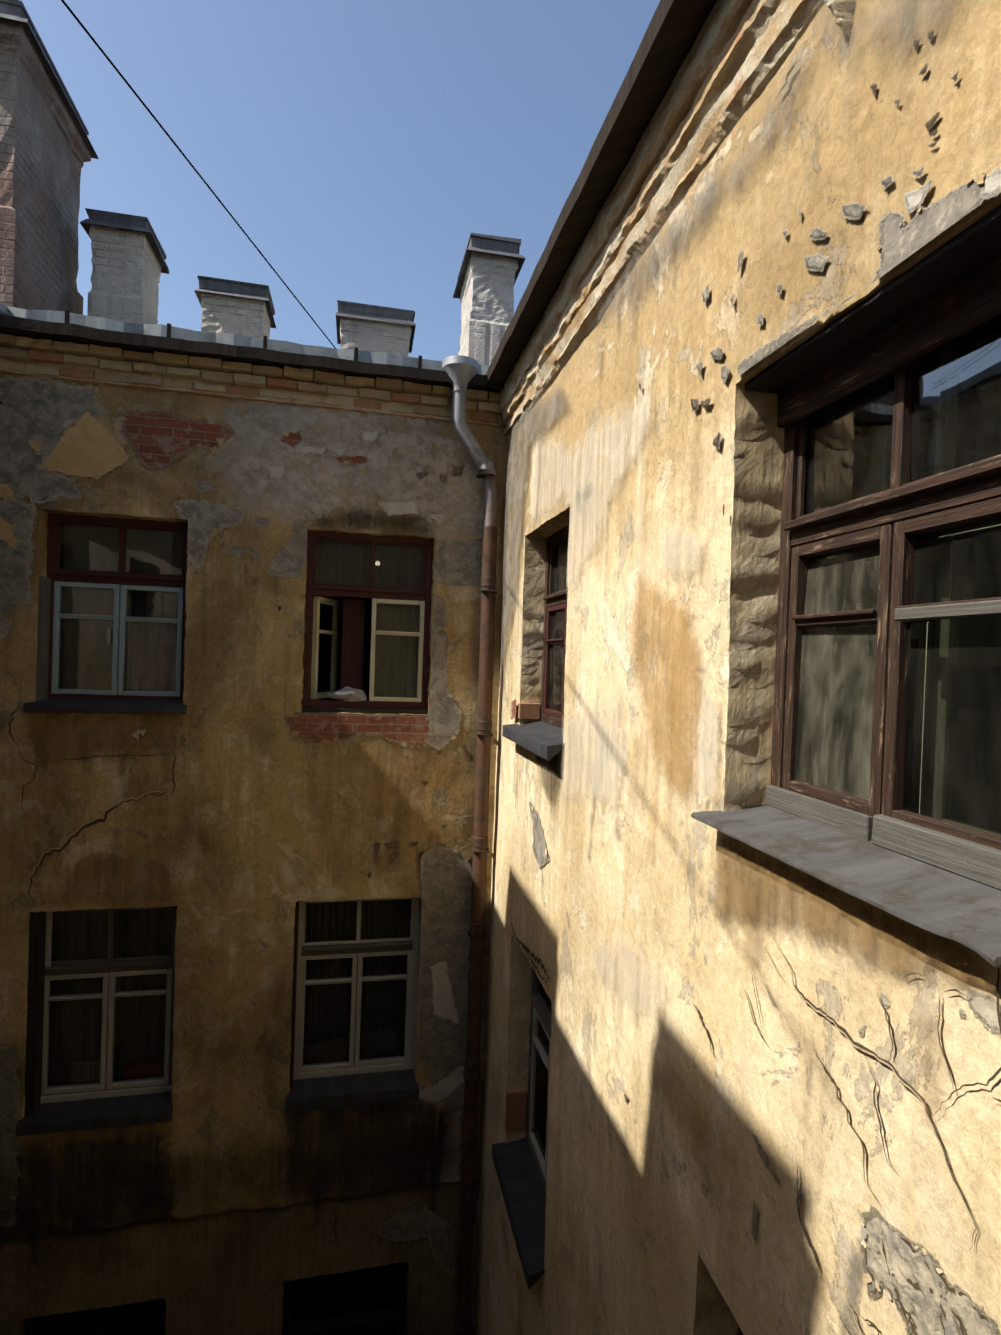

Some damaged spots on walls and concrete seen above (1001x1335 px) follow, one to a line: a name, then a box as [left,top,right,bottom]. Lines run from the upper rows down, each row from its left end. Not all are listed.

peeling [696,166,1001,383]
peeling [0,372,236,645]
peeling [278,430,379,465]
peeling [378,500,444,522]
spalling [284,539,483,750]
crack [8,699,176,911]
water stain [0,1132,173,1244]
crack [742,935,1001,1251]
spalling [844,1205,1000,1335]